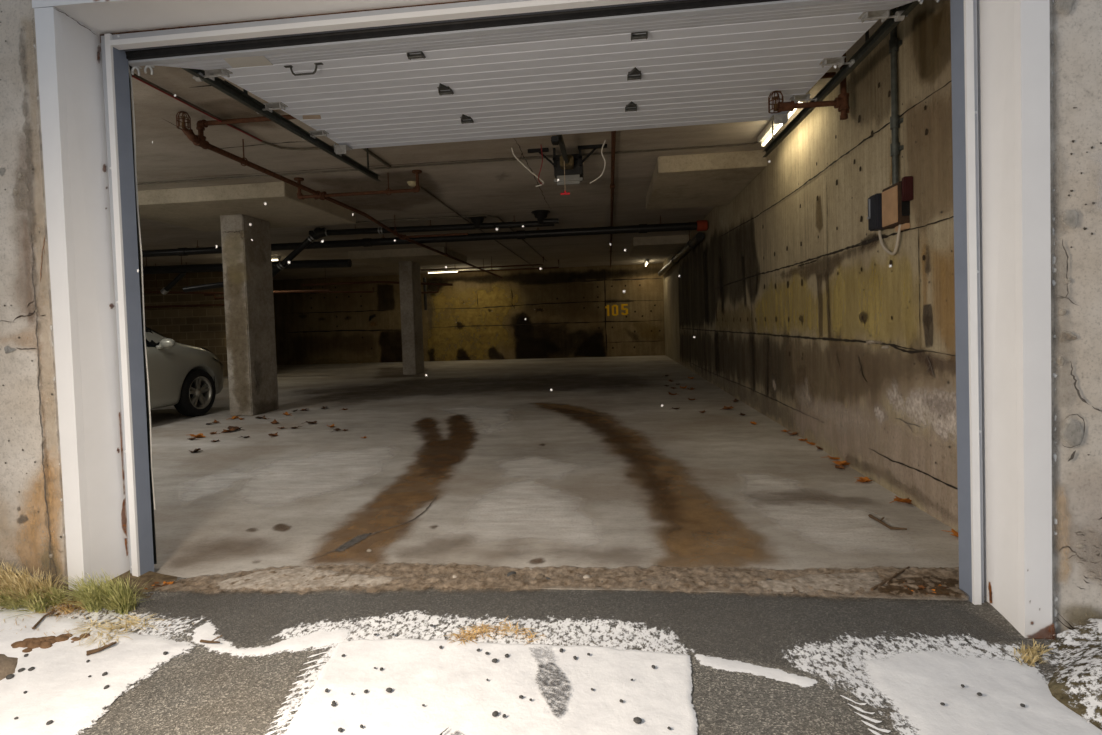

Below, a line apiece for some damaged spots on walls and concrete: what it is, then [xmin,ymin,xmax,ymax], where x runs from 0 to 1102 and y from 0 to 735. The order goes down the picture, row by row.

crack [1,222,62,577]
rust [117,412,128,555]
leakage [427,269,660,361]
leakage [679,219,893,454]
leakage [889,304,957,513]
crack [1063,361,1101,461]